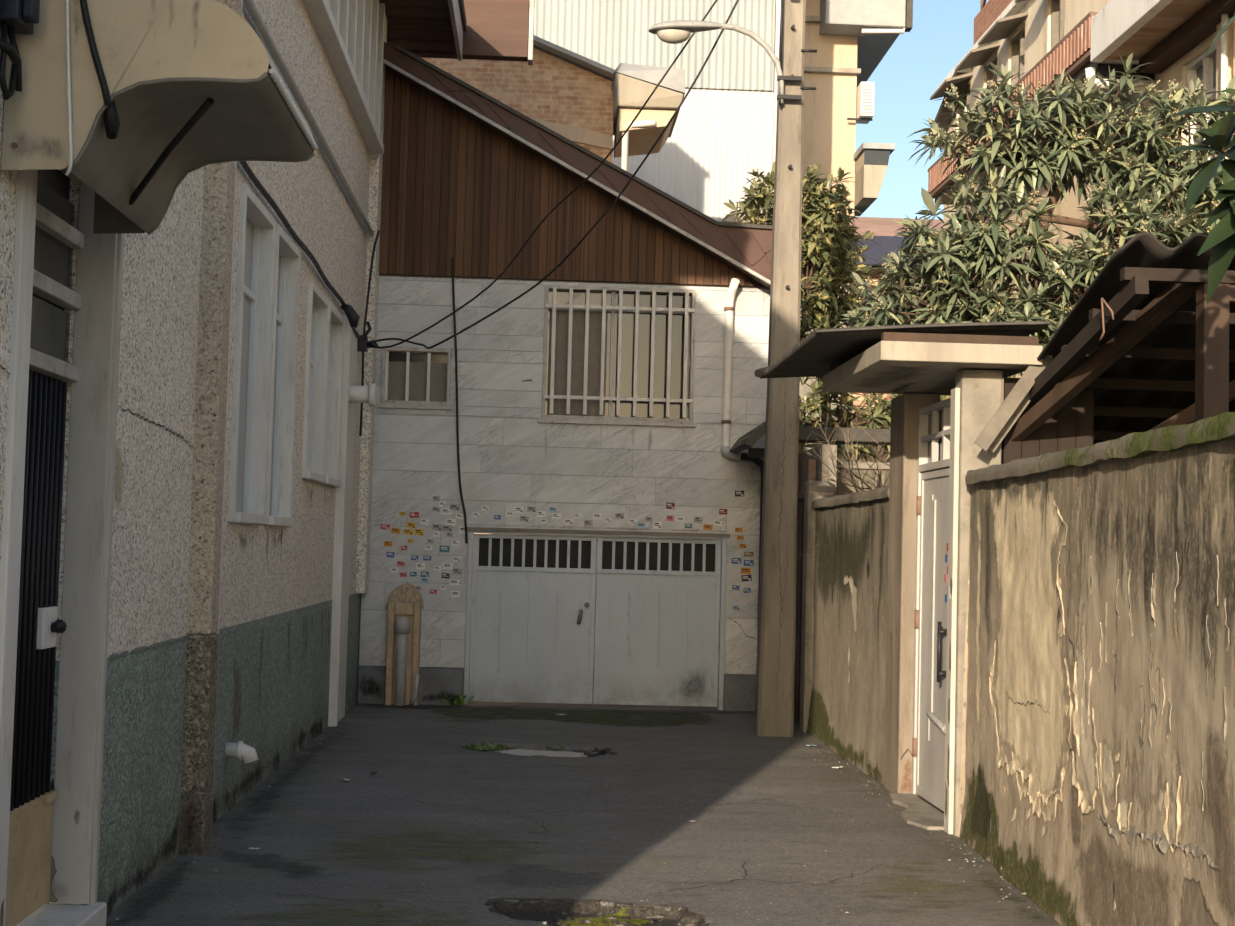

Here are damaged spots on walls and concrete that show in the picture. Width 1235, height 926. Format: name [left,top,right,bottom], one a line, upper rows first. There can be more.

damp [816,507,884,600]
peeling [844,563,869,634]
peeling [976,446,1235,871]
damp [1096,459,1235,648]